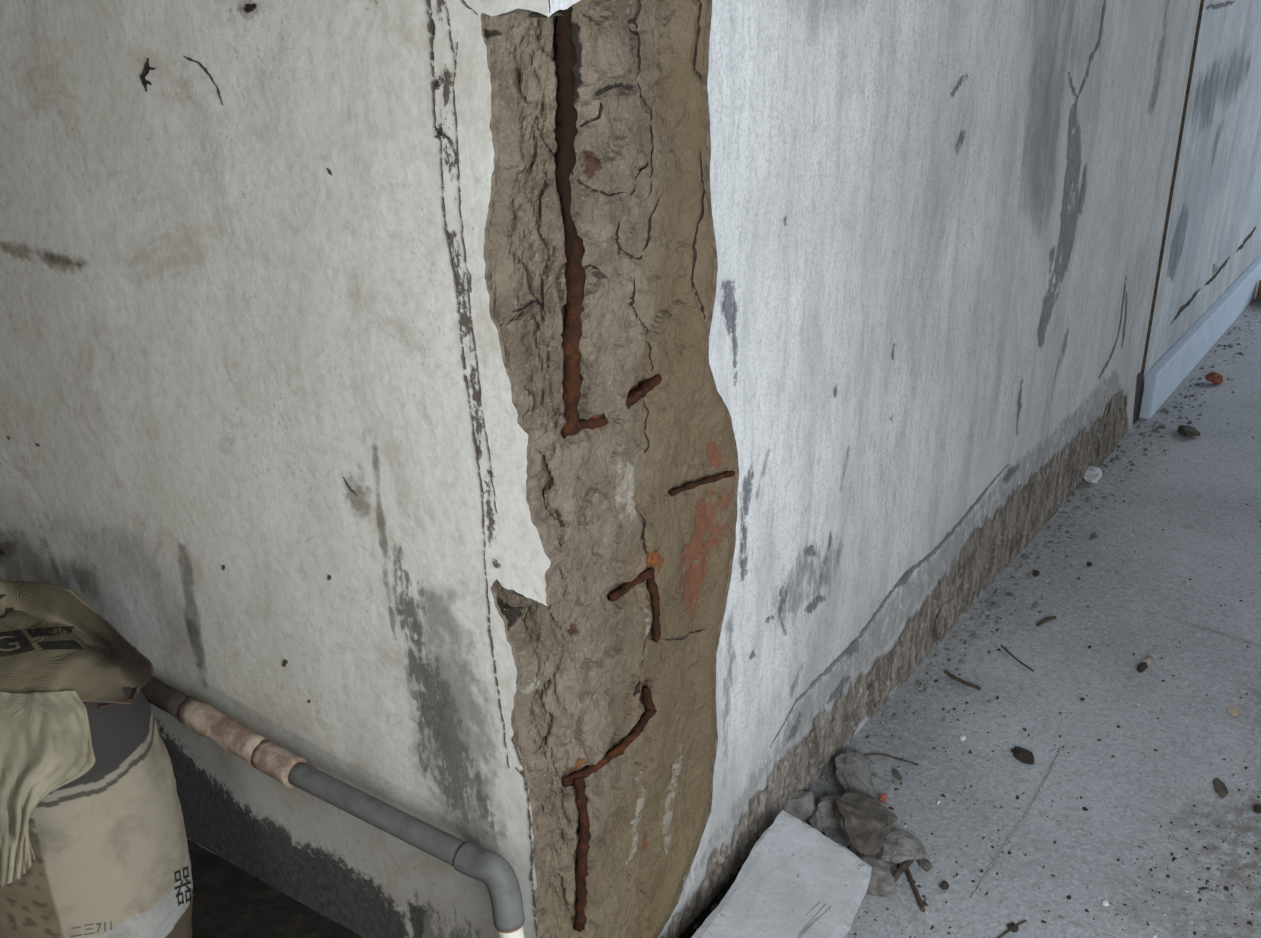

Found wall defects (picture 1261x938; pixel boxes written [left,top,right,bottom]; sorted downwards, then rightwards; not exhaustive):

crack [1069,0,1106,120]
peeling [433,64,458,181]
rust [582,151,602,179]
peeling [447,231,496,543]
crack [512,300,549,313]
crack [1099,276,1127,378]
crack [426,0,538,937]
spalling [484,0,1129,938]
water stain [389,548,495,833]